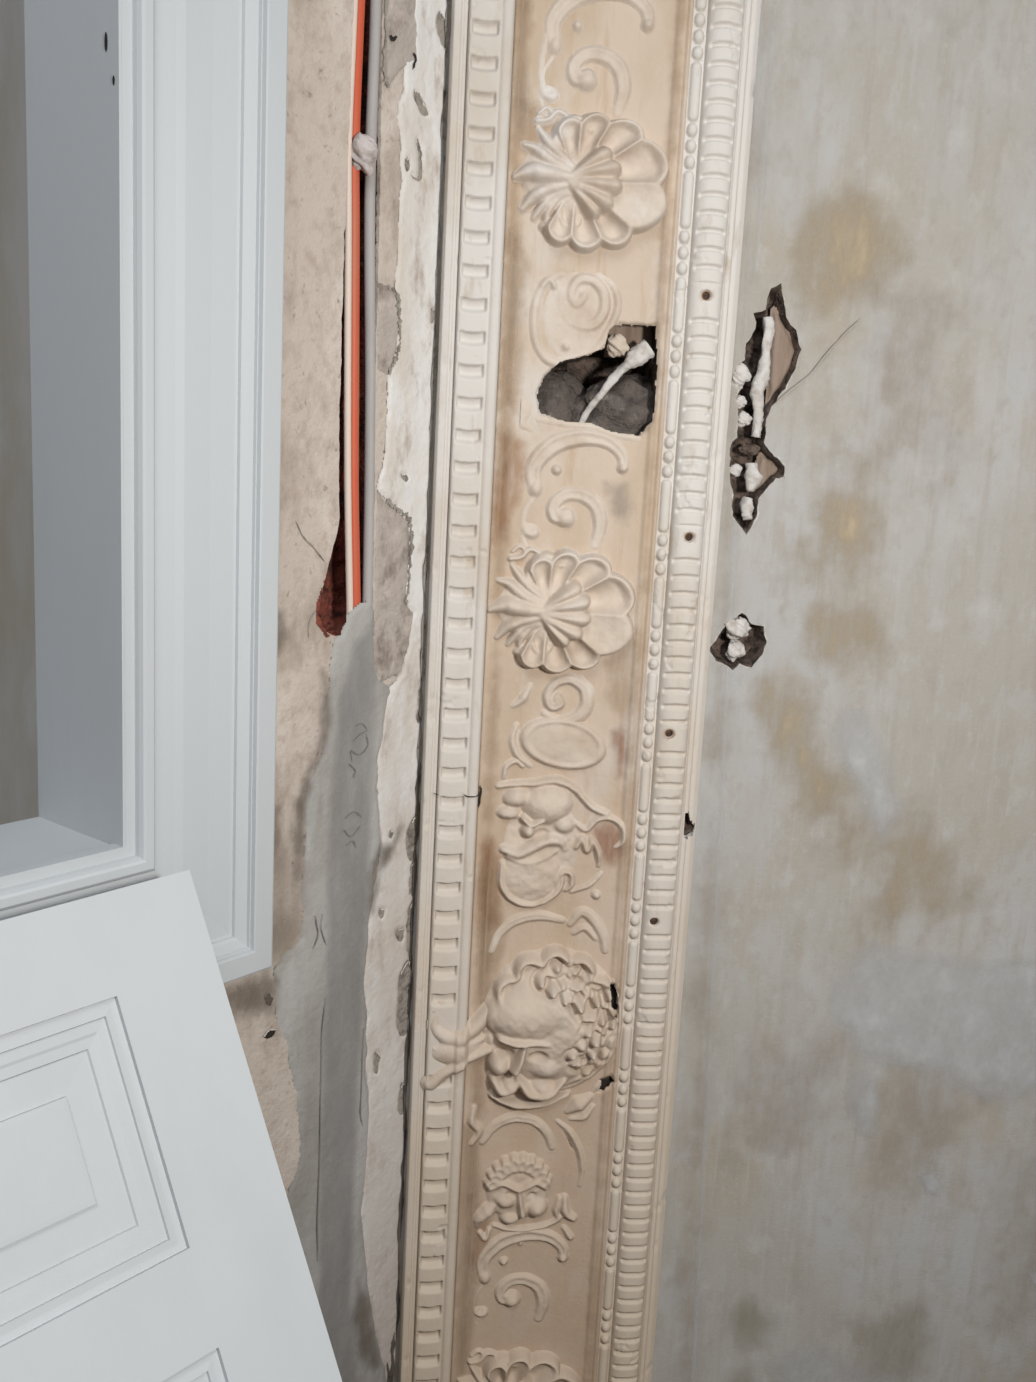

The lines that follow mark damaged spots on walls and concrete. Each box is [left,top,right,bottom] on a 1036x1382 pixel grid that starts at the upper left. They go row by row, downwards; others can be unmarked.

spalling [520,324,658,442]
flaking render [729,284,801,536]
peeling [316,0,449,1382]
flaking render [710,612,768,671]